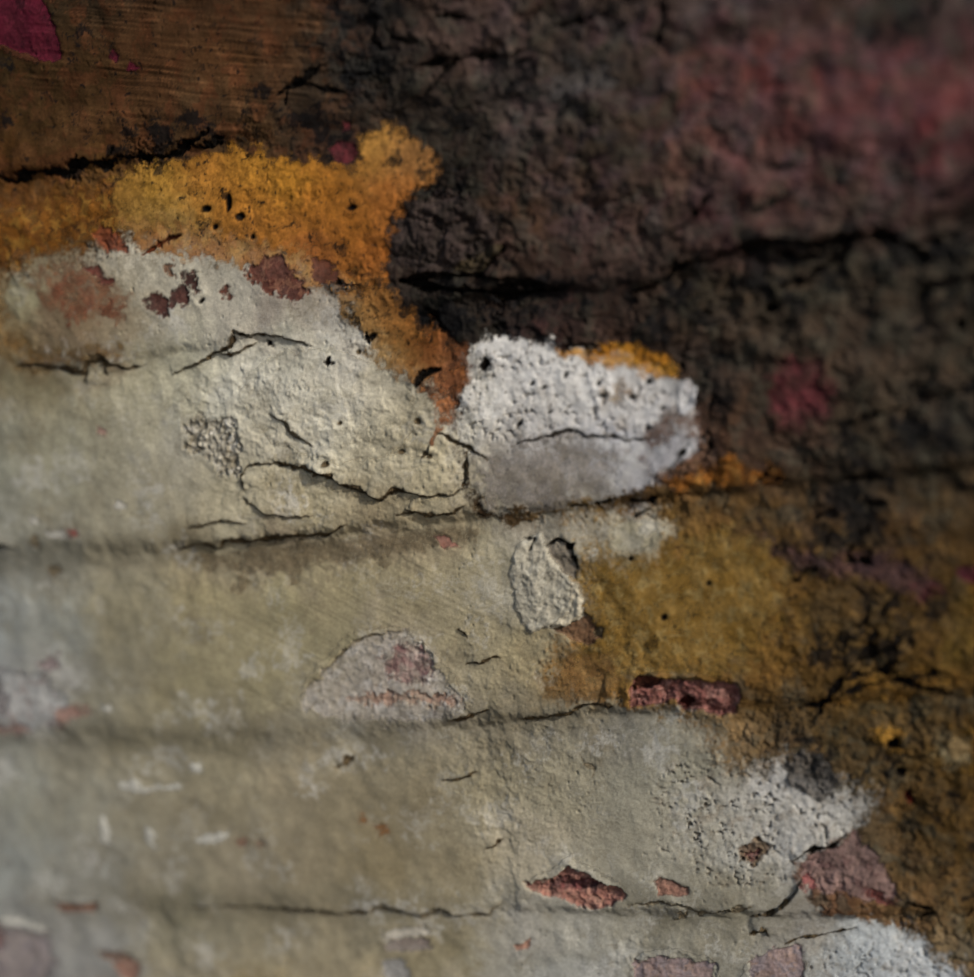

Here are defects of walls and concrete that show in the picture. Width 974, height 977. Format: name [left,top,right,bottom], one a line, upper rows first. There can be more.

rust [0,121,470,446]
crack [173,330,305,375]
crack [414,367,441,388]
crack [178,415,488,551]
peeling [301,626,473,729]
spalling [629,671,741,716]
rust [831,660,974,713]
rust [870,727,906,754]
spalling [527,854,626,909]
crack [643,835,845,944]
peeling [799,830,900,905]
peeling [632,947,720,977]